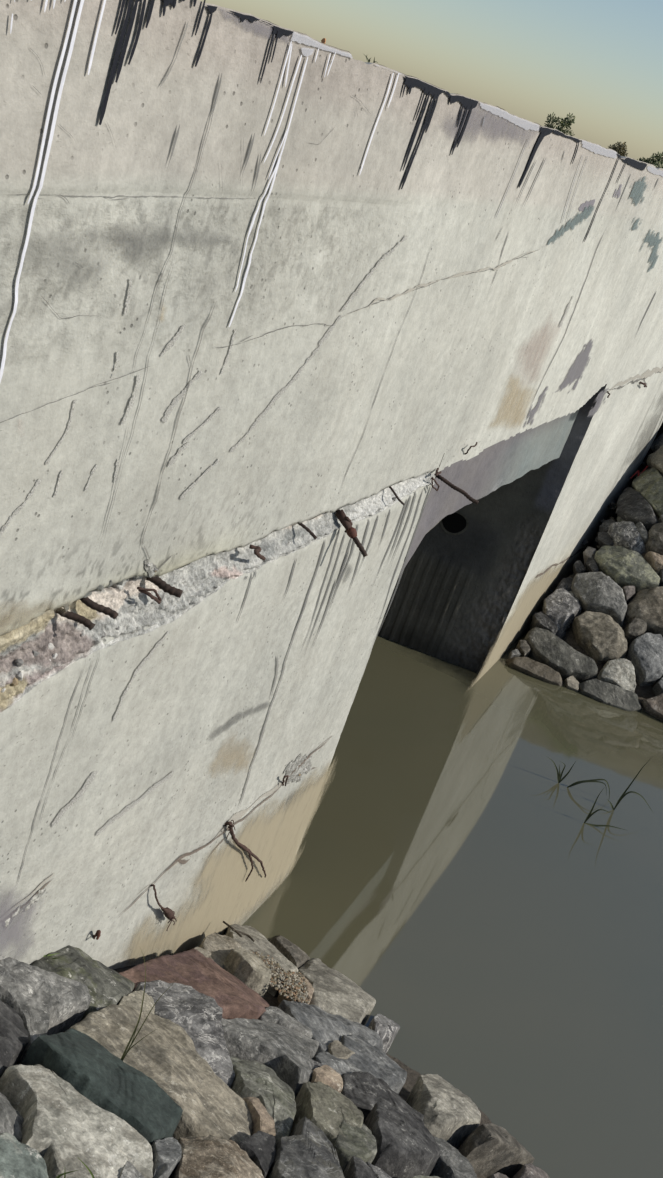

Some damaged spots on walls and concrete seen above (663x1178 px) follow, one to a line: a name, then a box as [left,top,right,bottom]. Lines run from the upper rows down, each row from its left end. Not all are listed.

damp [0,0,84,383]
damp [88,0,106,75]
damp [99,0,213,125]
damp [229,20,336,327]
damp [359,73,546,217]
damp [584,158,631,242]
crack [142,229,539,570]
crack [530,229,606,407]
spalling [0,473,479,713]
damp [295,486,431,651]